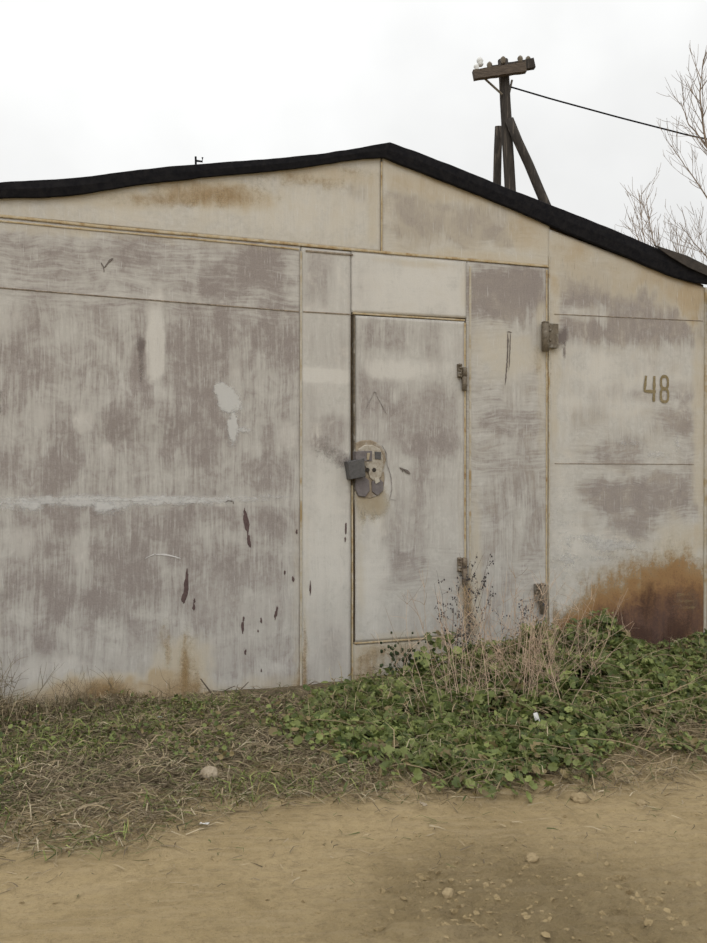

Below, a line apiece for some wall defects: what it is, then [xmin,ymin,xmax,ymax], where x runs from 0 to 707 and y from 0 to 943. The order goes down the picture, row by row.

peeling [214,382,248,445]
corrosion [557,553,704,644]